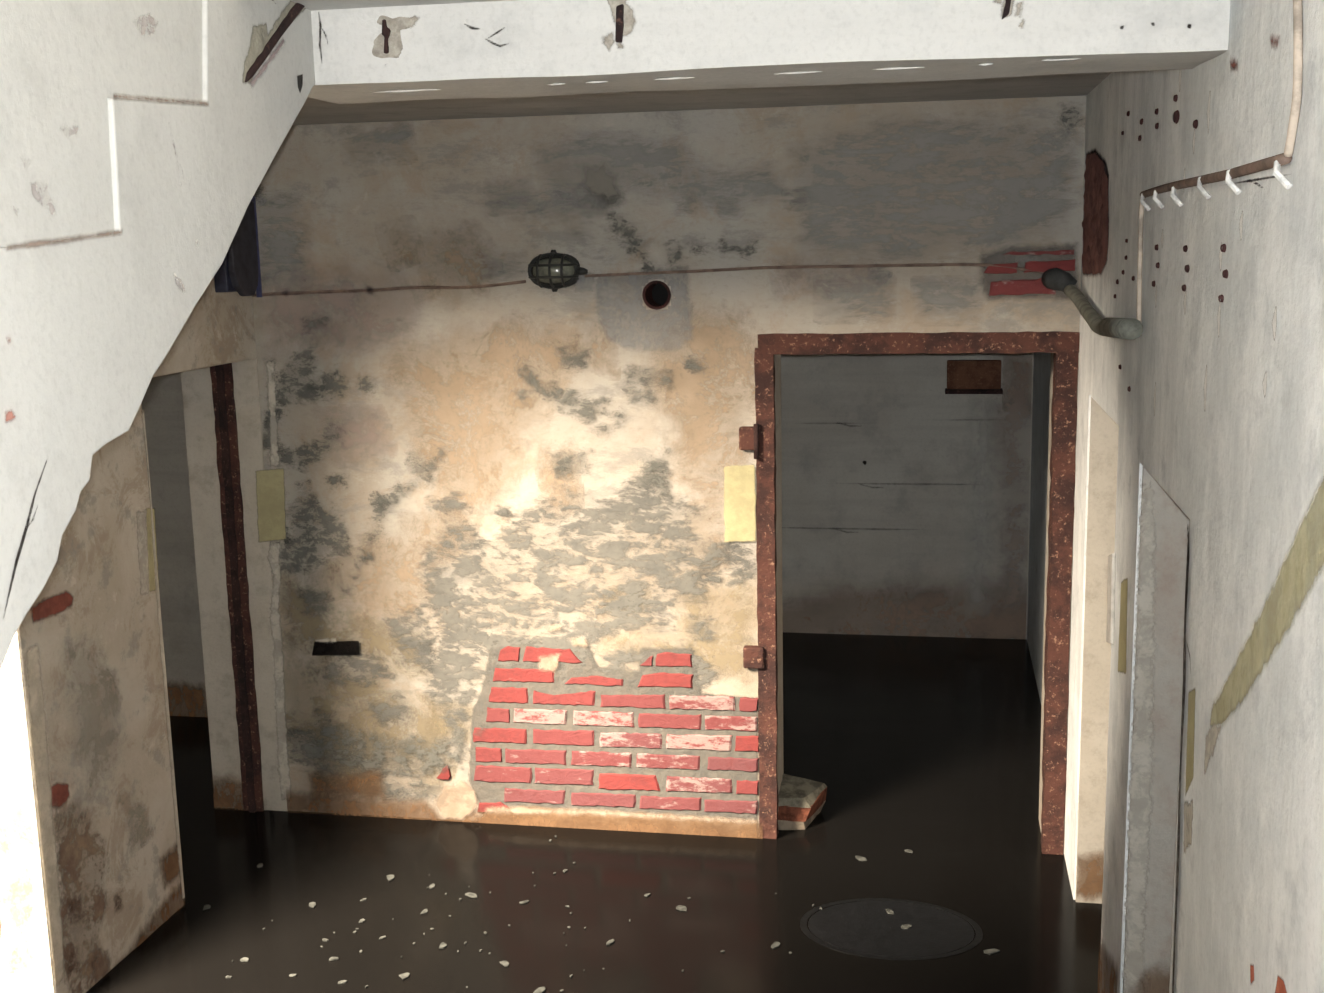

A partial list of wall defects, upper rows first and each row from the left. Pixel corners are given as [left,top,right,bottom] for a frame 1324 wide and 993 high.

spalling [372,15,418,58]
spalling [604,0,635,49]
spalling [994,0,1024,27]
flaking render [982,150,1109,298]
leakage [395,326,610,508]
leakage [655,318,755,493]
peeling [31,591,73,622]
peeling [142,412,185,898]
leakage [283,512,763,839]
flaking render [383,449,759,832]
leakage [795,590,1027,639]
leakage [128,843,186,955]